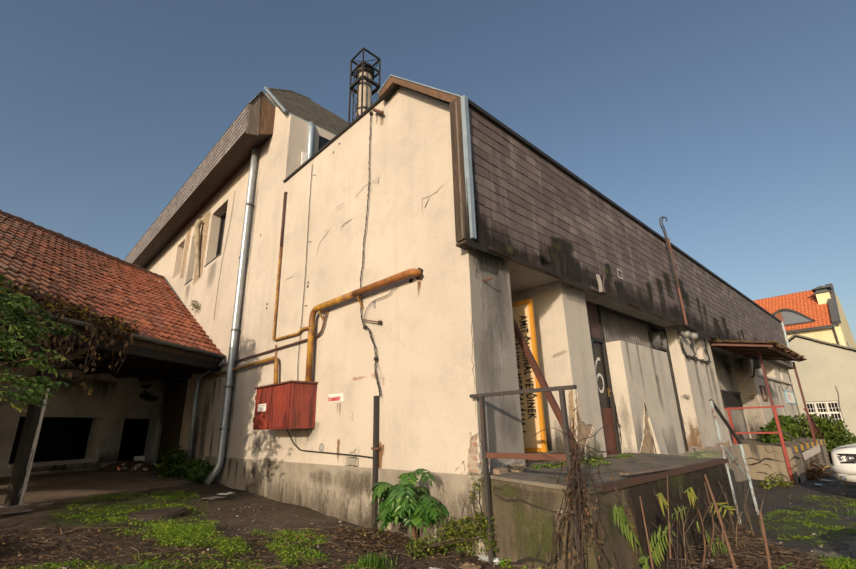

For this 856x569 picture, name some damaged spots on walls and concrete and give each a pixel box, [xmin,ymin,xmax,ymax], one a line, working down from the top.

water stain [465,208,488,253]
corrosion [351,268,422,297]
water stain [500,238,741,341]
spalling [457,432,524,475]
spalling [568,389,595,458]
spalling [639,403,669,455]
water stain [228,458,372,529]